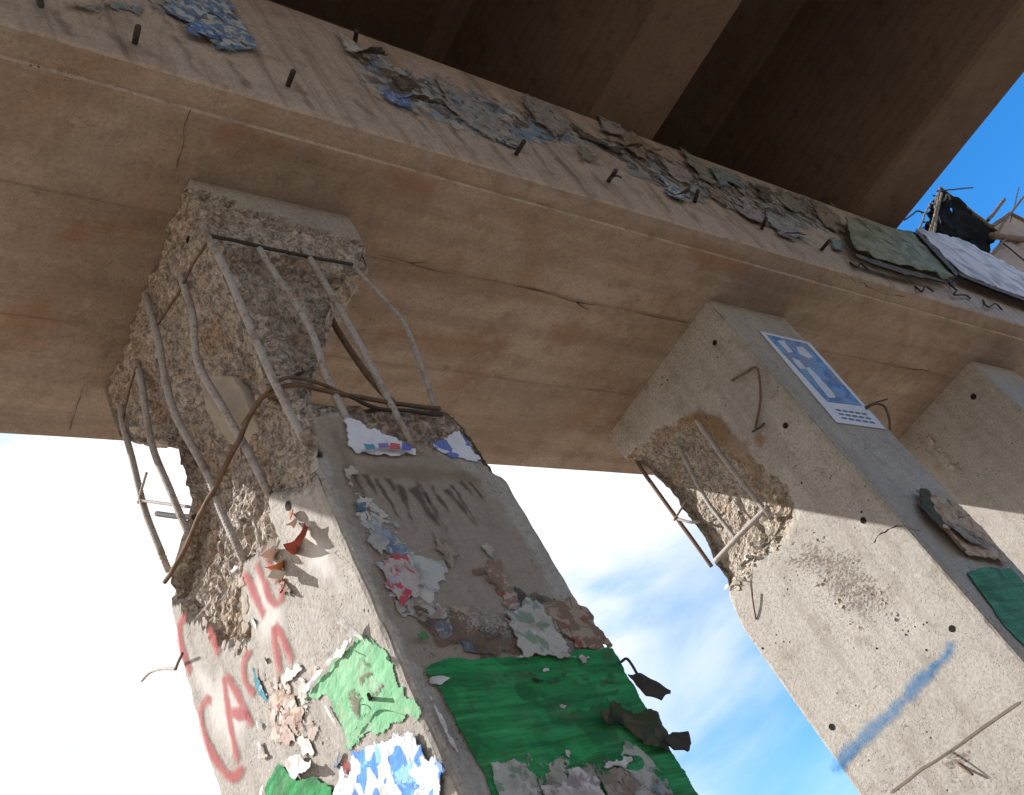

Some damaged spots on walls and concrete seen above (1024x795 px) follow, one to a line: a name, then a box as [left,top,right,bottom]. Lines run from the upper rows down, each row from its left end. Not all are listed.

crack [513,285,593,310]
spalling [108,188,494,657]
damp [354,474,483,523]
spalling [627,413,898,637]
spalling [942,741,971,782]